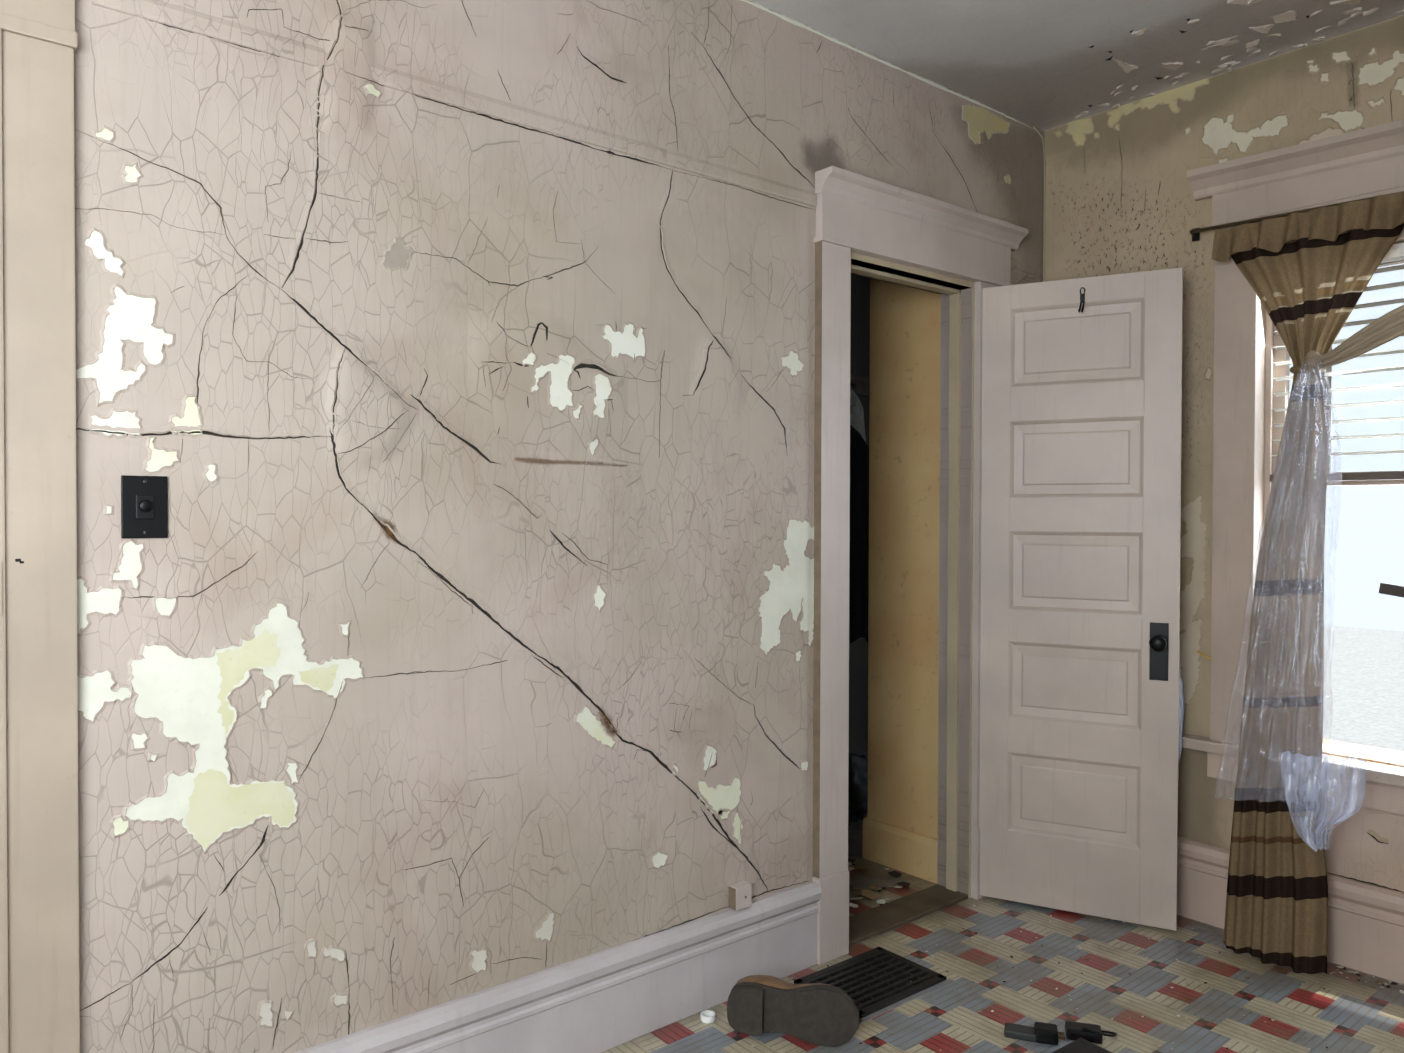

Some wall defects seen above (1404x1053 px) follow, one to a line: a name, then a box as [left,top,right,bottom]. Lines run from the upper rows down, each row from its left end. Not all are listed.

peeling [741,0,1035,145]
peeling [1054,0,1404,164]
crack [929,103,980,213]
peeling [76,227,204,475]
peeling [520,321,647,421]
crack [75,0,815,940]
peeling [757,517,814,663]
peeling [78,600,365,855]
peeling [574,704,617,750]
peeling [696,744,744,845]
crack [80,826,282,1053]
crack [428,944,547,1000]